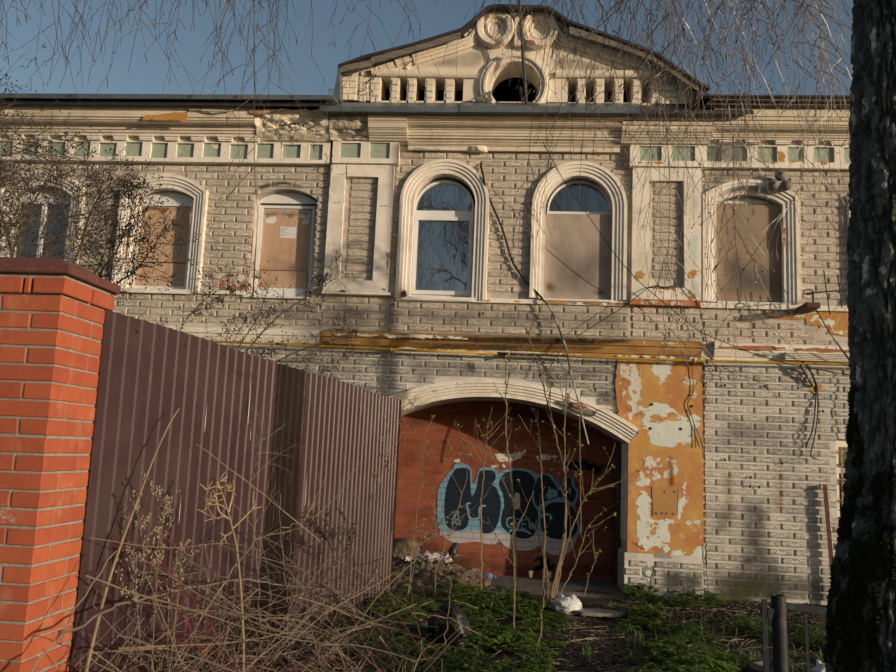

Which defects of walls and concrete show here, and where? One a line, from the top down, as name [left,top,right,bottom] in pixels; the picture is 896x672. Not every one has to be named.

peeling [143,106,235,121]
crack [279,119,347,203]
peeling [764,310,849,336]
peeling [328,333,582,355]
peeling [719,345,848,356]
peeling [618,355,705,559]
damp [720,508,816,598]